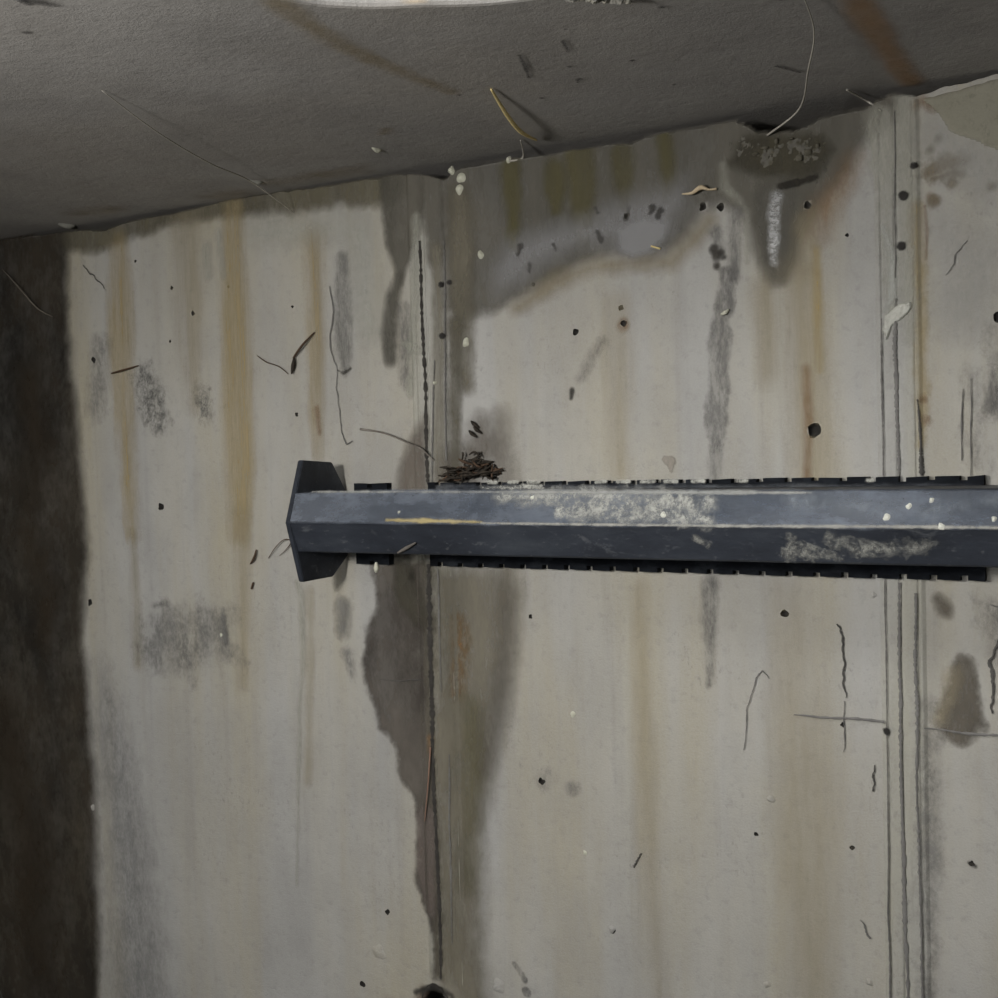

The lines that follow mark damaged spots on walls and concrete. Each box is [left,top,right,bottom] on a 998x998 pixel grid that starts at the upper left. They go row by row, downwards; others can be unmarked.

leakage [381,95,896,490]
leakage [0,179,383,998]
leakage [363,554,514,998]
crack [794,624,885,752]
crack [924,640,998,737]
leakage [940,657,985,745]